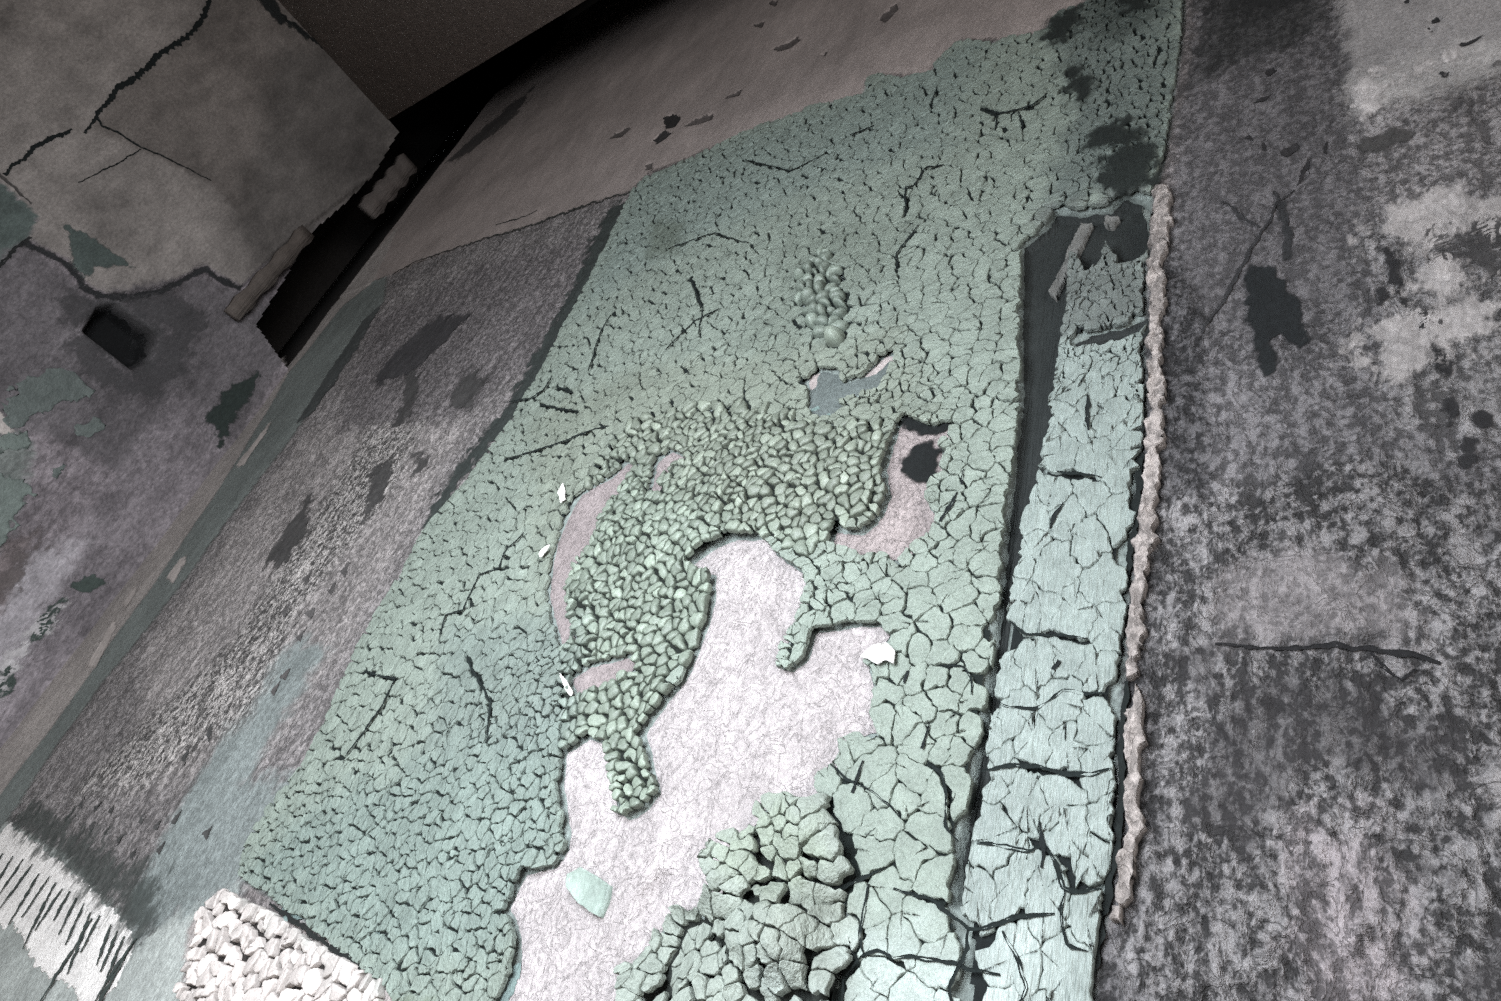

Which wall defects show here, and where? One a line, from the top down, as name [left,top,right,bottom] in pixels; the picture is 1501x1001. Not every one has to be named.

crack [0,0,212,268]
damp [1040,3,1085,44]
damp [1054,64,1095,104]
damp [1080,114,1174,205]
flaking render [539,464,632,644]
crack [238,0,1183,1001]
flaking render [834,427,950,560]
peeling [0,598,69,699]
crack [1215,641,1441,681]
flaking render [499,540,895,1001]
peeling [0,822,135,1001]
peeling [172,888,386,1001]